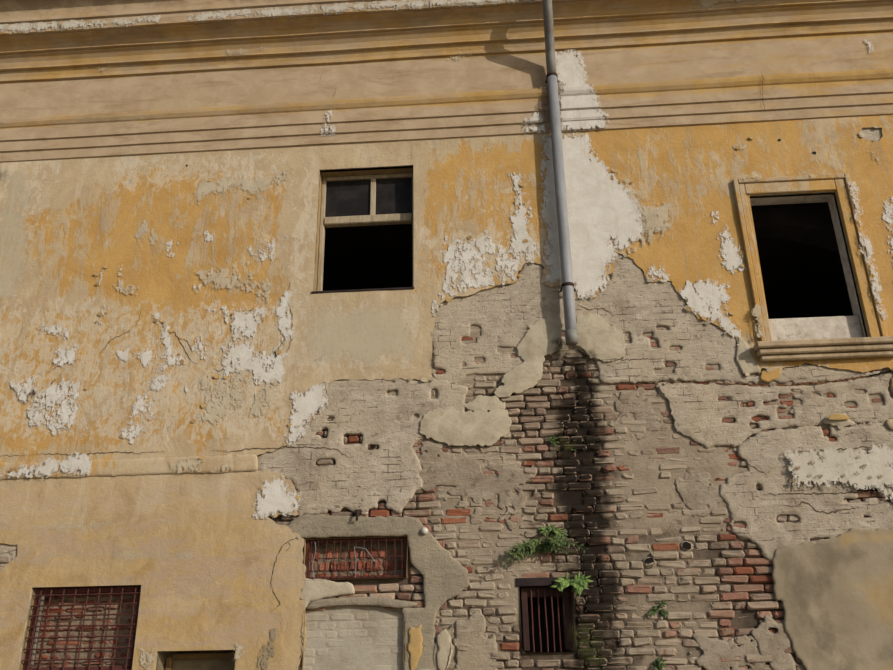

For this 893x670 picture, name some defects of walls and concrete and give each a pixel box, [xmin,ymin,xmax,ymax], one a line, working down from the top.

peeling [190,168,289,205]
peeling [135,220,179,257]
peeling [113,264,139,295]
peeling [10,375,88,436]
peeling [37,321,78,368]
peeling [114,313,187,444]
peeling [185,236,294,425]
flaking render [253,49,893,670]
peeling [169,455,233,474]
damp [552,356,627,670]
flaking render [0,543,18,571]
crack [270,539,294,611]